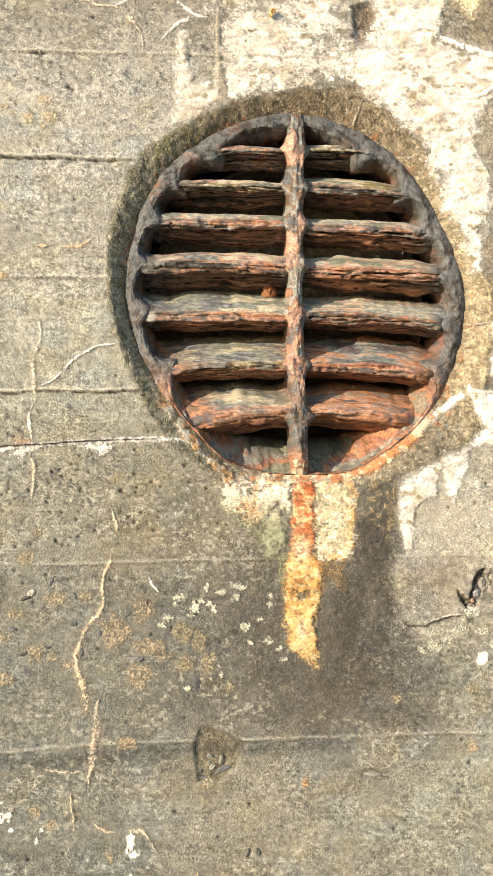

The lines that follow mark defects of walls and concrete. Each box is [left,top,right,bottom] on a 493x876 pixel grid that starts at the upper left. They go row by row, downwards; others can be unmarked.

crack [81,0,226,97]
water stain [169,0,493,273]
crack [45,559,159,856]
water stain [151,383,242,484]
corrosion [219,414,434,668]
water stain [242,384,493,704]
peeling [419,568,493,654]